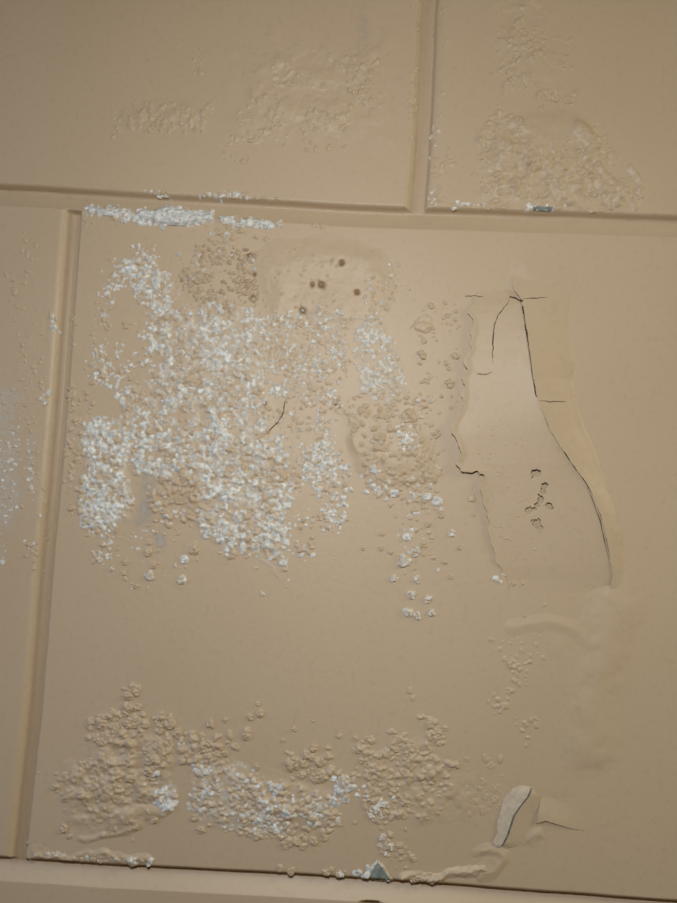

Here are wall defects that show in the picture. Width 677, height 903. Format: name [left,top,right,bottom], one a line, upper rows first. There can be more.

efflorescence [62,204,462,621]
peeling [451,274,625,607]
peeling [322,785,585,884]